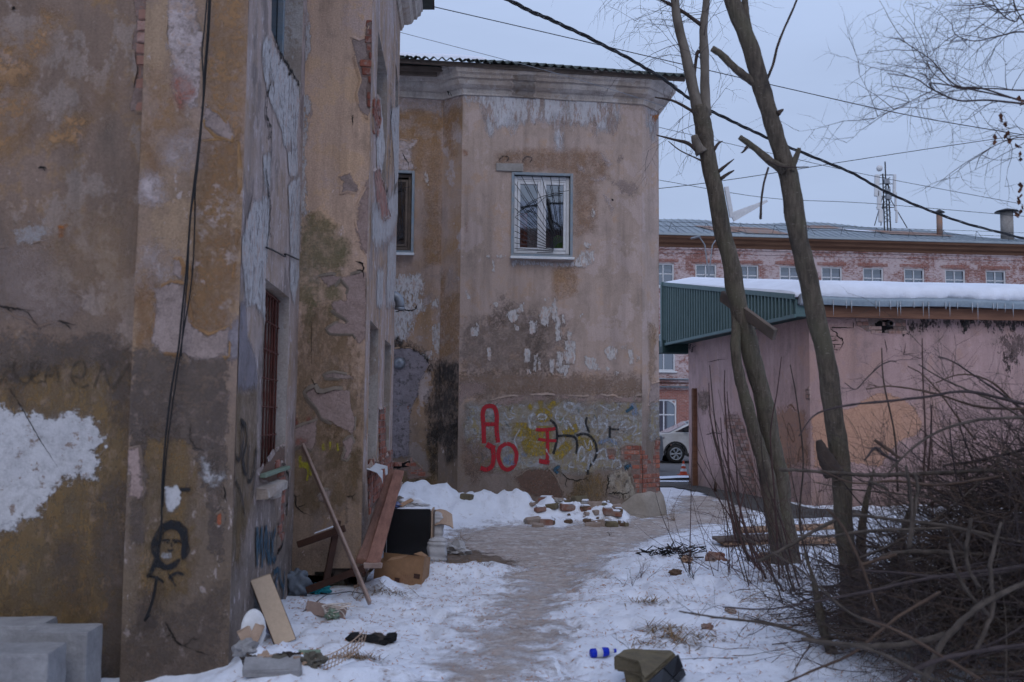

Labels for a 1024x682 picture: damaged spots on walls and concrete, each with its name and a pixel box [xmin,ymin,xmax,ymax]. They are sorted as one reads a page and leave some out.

spalling [127,0,146,115]
spalling [163,0,246,143]
peeling [242,151,272,328]
peeling [261,35,313,303]
peeling [337,20,439,343]
peeling [486,151,660,407]
spalling [256,383,357,550]
leakage [394,336,642,485]
spalling [606,437,660,501]